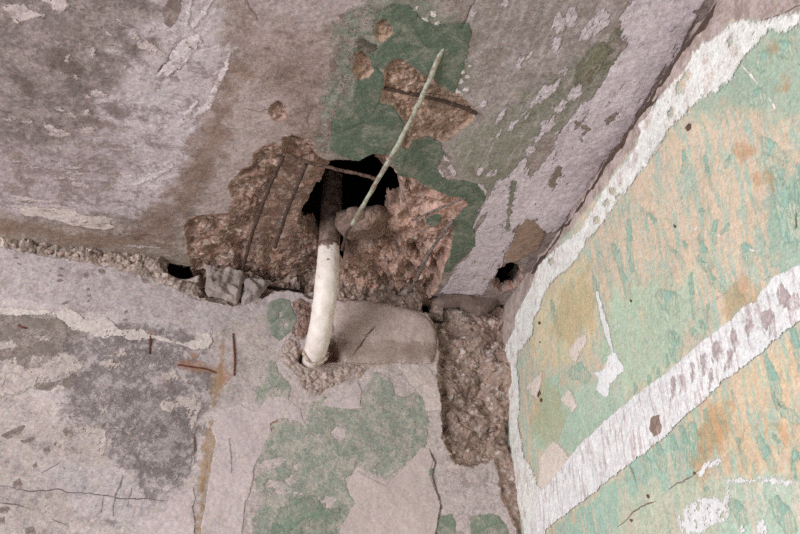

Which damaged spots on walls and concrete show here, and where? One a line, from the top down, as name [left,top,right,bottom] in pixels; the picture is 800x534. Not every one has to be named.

spalling [0,0,476,395]
peeling [336,0,800,534]
flaking render [60,386,203,498]
peeling [256,361,291,405]
peeling [251,372,429,534]